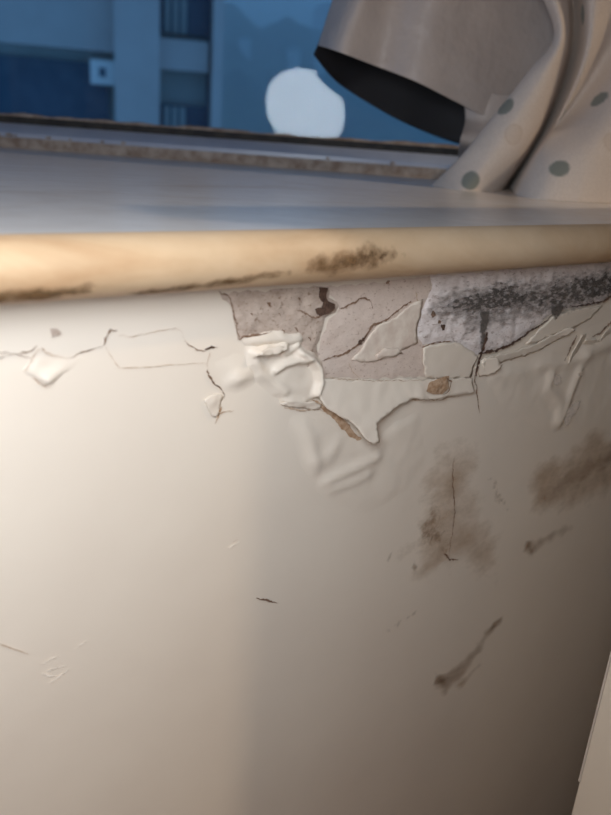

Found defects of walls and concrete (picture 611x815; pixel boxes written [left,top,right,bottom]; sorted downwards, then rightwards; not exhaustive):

crack [69,328,215,368]
flaking render [204,262,611,444]
crack [474,332,488,412]
leakage [442,272,611,348]
crack [564,322,611,365]